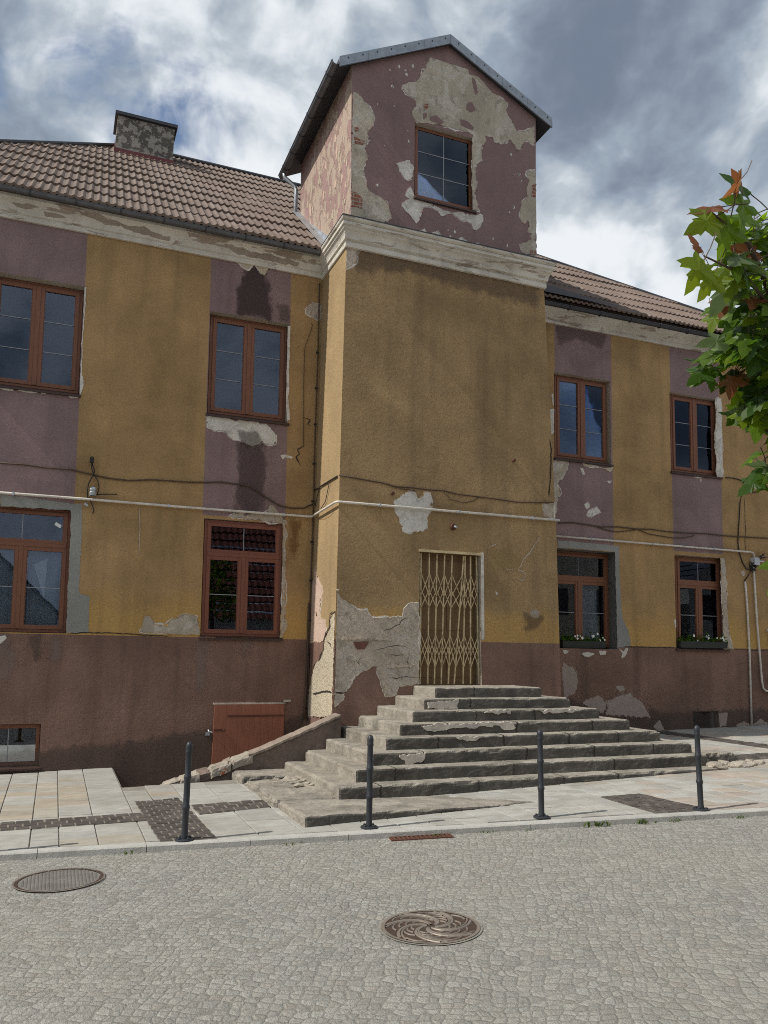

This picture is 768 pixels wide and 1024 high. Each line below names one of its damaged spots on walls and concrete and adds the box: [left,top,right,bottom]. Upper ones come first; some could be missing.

flaking render [307,58,536,244]
flaking render [507,169,537,257]
leakage [237,266,271,320]
flaking render [205,416,293,459]
leakage [237,442,265,514]
flaking render [393,489,433,534]
flaking render [553,458,613,514]
flaking render [139,613,201,636]
flaking render [308,566,421,719]
crack [358,618,410,679]
flaking render [539,650,664,731]
spalling [421,709,515,741]